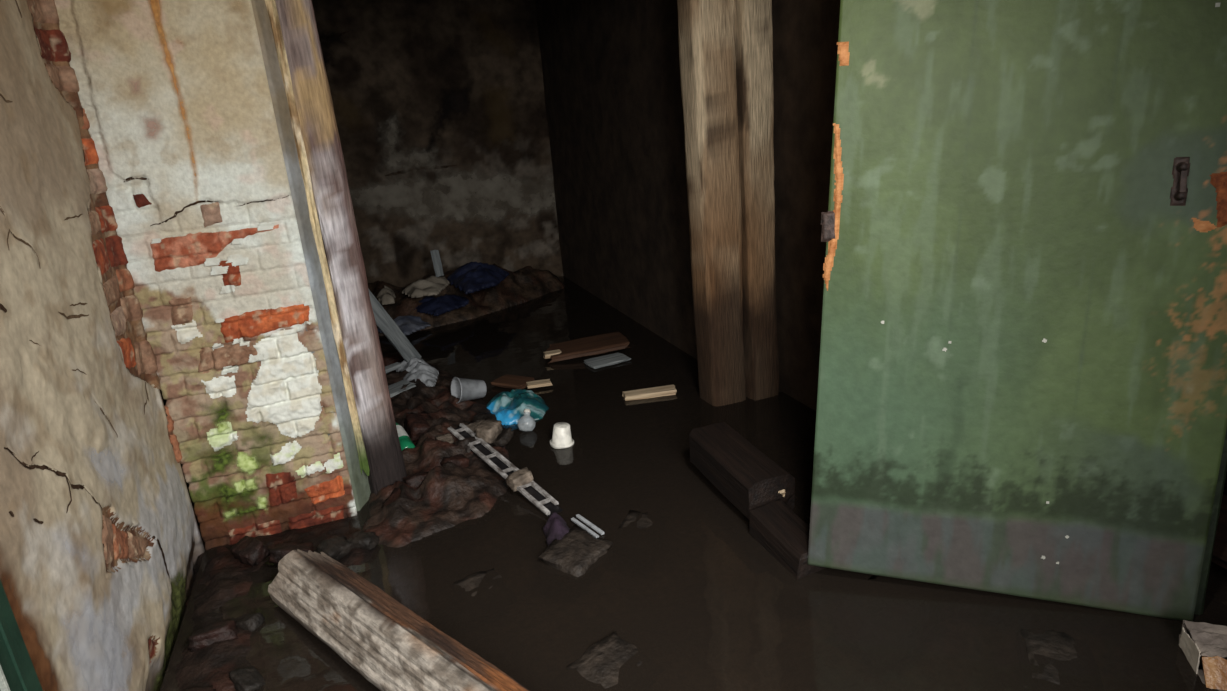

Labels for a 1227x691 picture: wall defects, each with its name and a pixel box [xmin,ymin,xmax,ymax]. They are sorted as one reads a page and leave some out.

rust [150,0,196,176]
spalling [27,0,161,390]
peeling [150,201,279,294]
crack [150,195,289,226]
spalling [164,405,182,464]
peeling [169,297,345,545]
crack [2,441,102,524]
spalling [102,500,154,580]